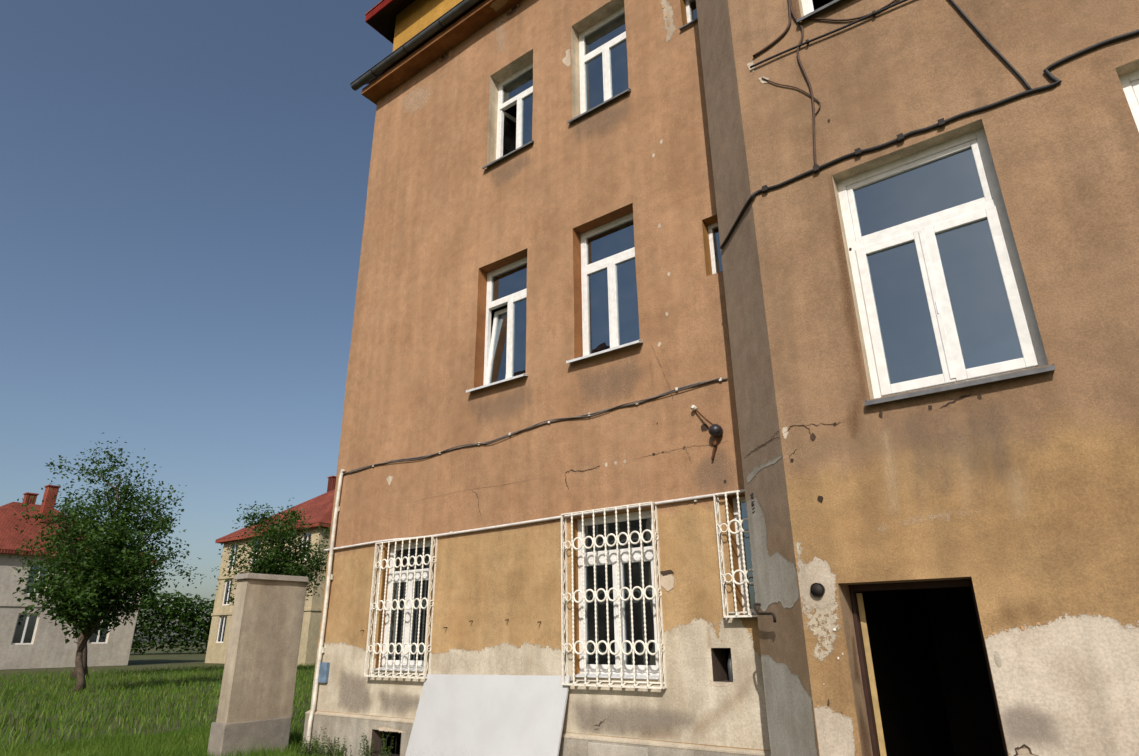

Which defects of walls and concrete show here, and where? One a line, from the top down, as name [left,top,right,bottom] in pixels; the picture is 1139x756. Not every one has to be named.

peeling [661,0,676,42]
crack [634,422,842,460]
spalling [660,570,675,591]
peeling [747,497,843,661]
peeling [311,614,856,756]
peeling [984,613,1139,756]